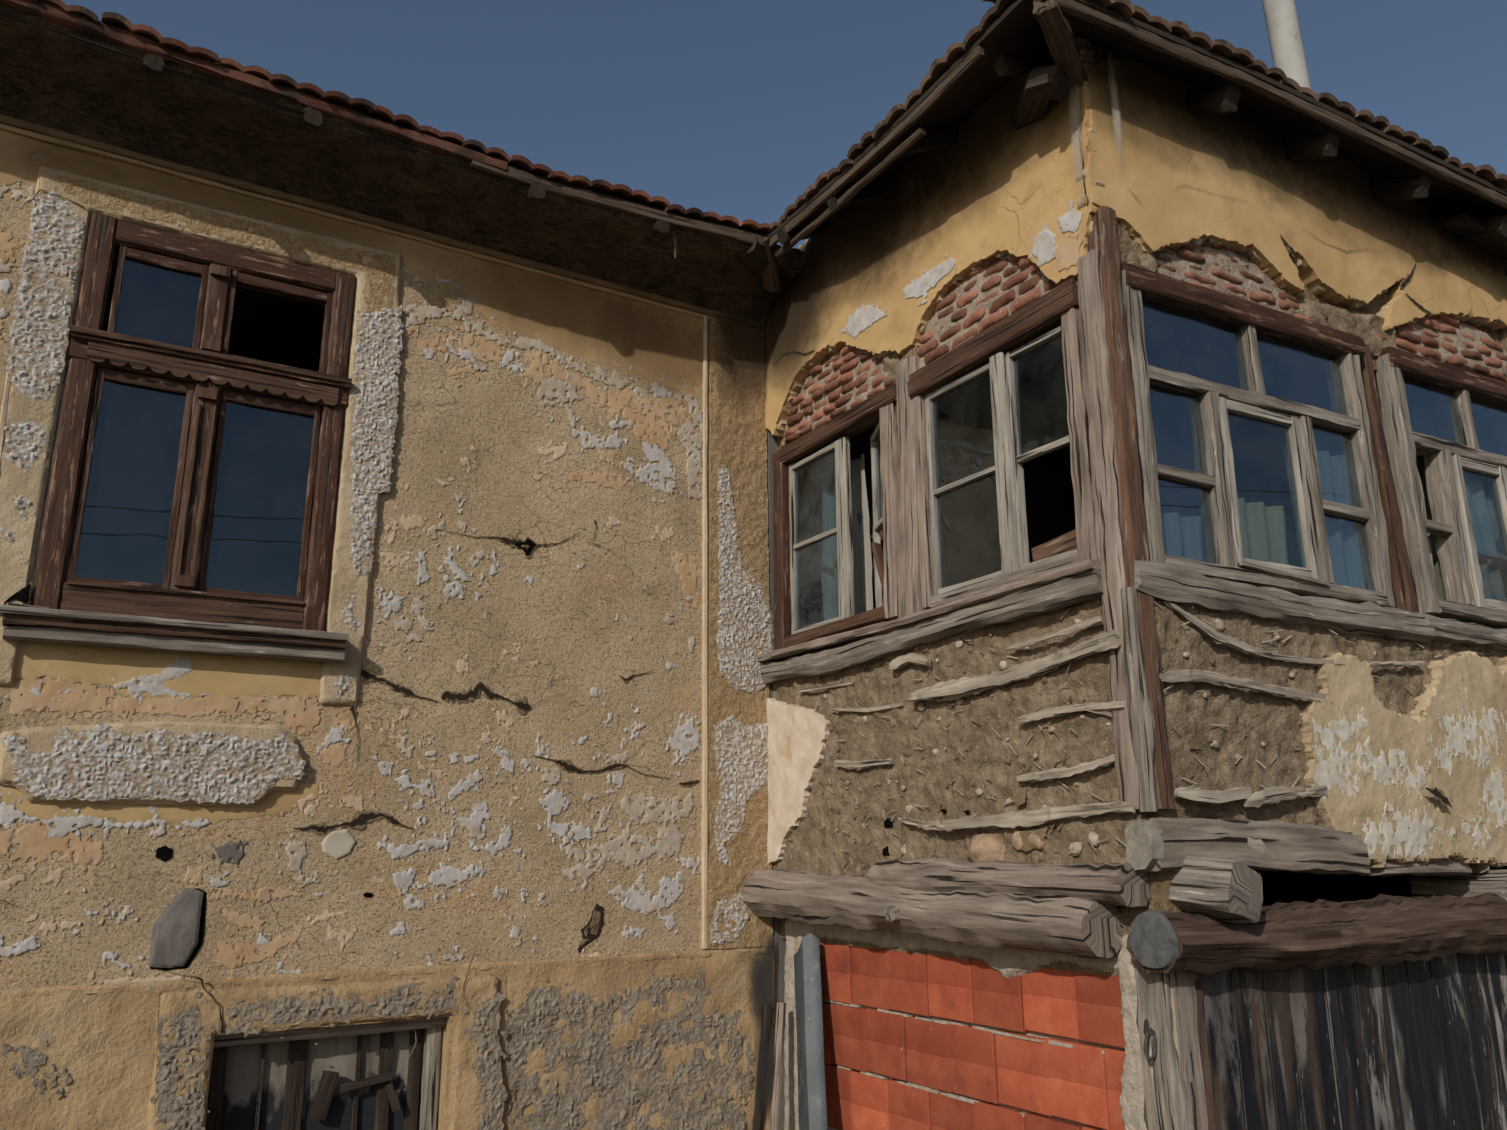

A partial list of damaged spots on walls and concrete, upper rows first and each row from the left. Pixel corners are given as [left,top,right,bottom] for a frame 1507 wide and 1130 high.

peeling [901,254,957,306]
peeling [1025,199,1083,281]
crack [1280,233,1365,257]
crack [1400,262,1434,316]
spalling [3,582,32,605]
crack [445,520,627,590]
spalling [341,266,1152,877]
crack [349,668,558,761]
spalling [1153,597,1507,860]
crack [532,755,700,787]
crack [263,808,419,841]
spalling [0,658,769,1130]